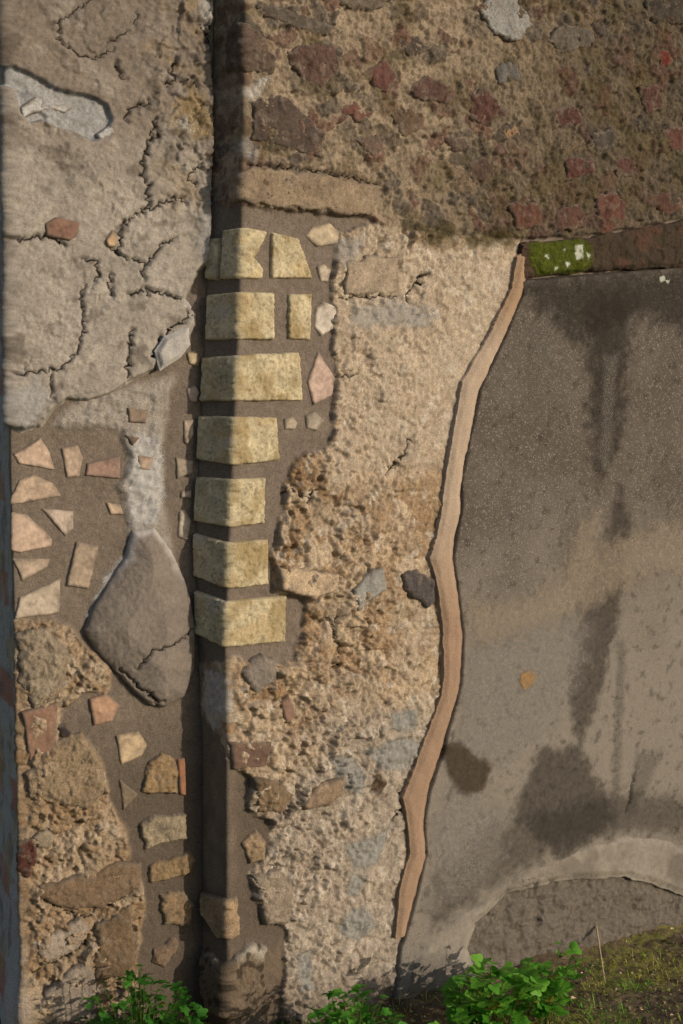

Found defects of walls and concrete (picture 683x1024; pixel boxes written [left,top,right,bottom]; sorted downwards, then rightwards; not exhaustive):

crack [52,0,138,80]
crack [13,60,202,399]
damp [525,272,683,476]
crack [119,630,190,705]
damp [441,743,491,793]